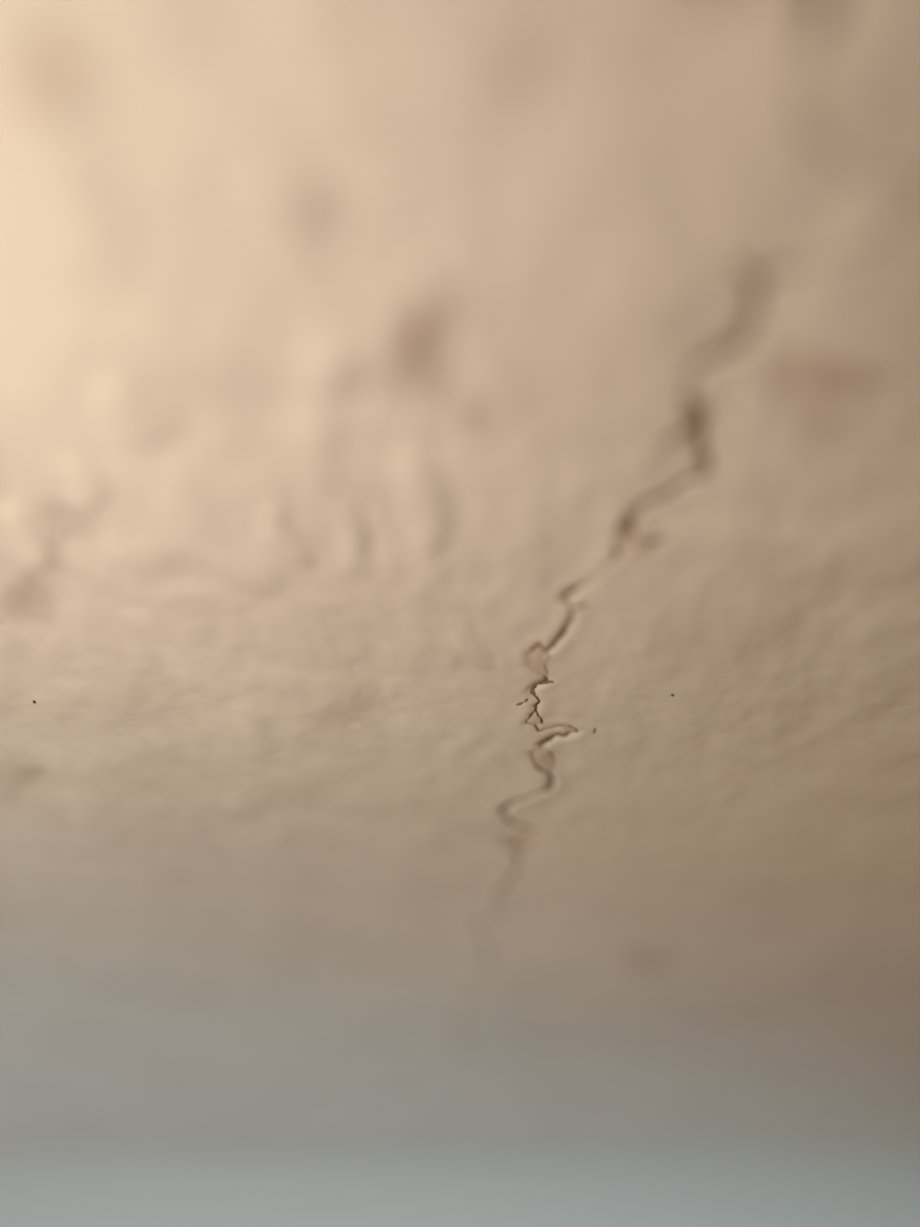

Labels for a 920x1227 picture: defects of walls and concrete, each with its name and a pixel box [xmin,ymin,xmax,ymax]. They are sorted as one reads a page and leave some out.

crack [460,0,920,1058]